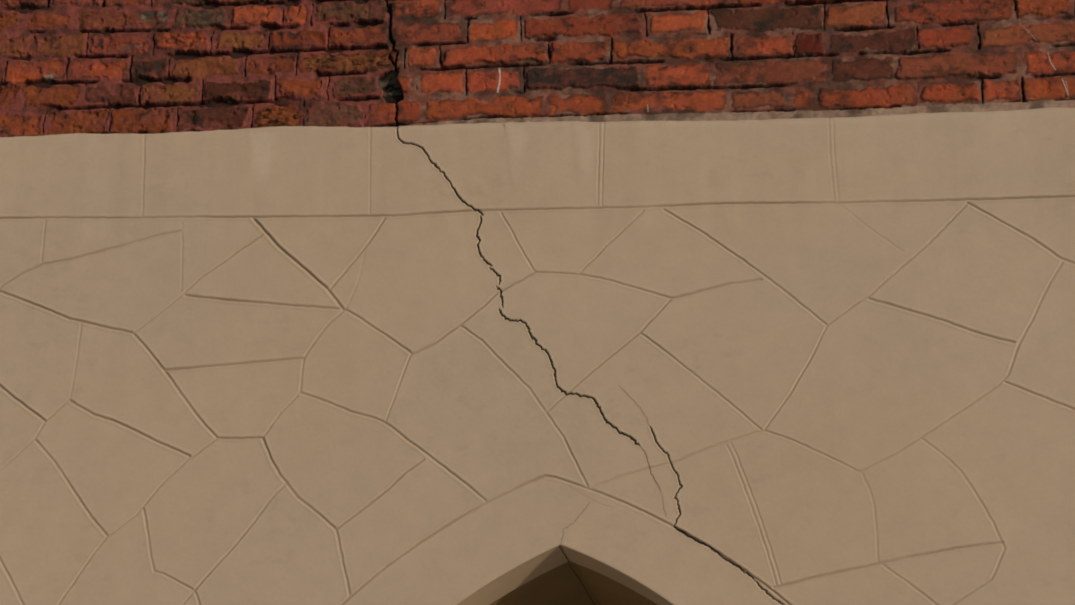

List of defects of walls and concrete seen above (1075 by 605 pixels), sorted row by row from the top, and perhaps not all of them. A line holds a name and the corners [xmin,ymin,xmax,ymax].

crack [385,0,399,72]
crack [395,102,783,605]